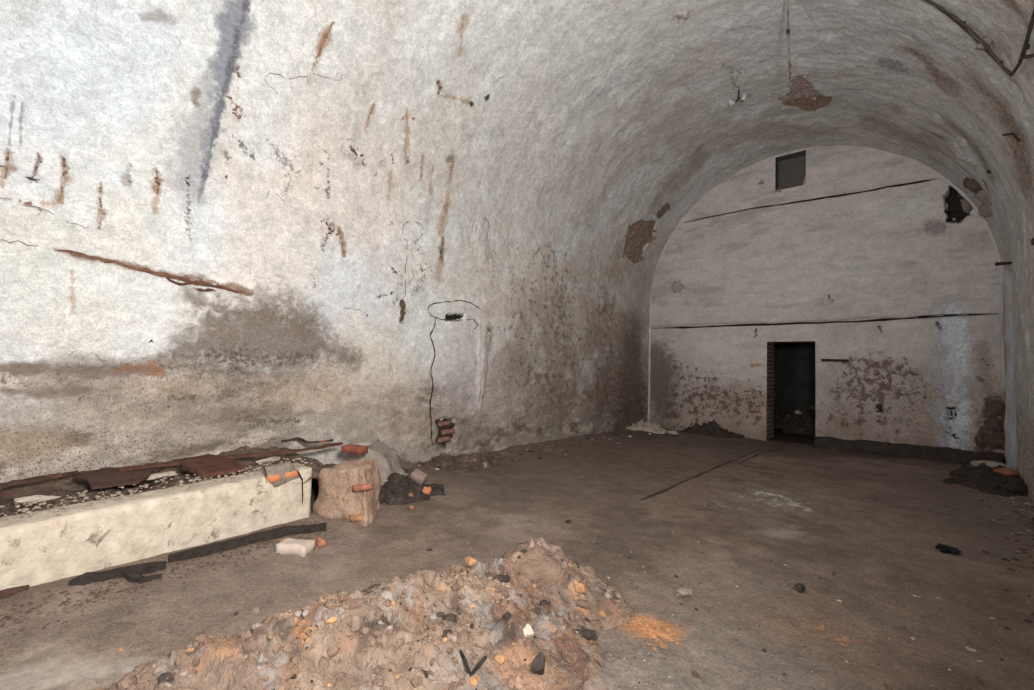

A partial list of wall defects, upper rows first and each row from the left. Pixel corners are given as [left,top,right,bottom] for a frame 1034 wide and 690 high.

rust [317,22,334,57]
peeling [777,76,820,103]
rust [19,157,70,211]
spalling [944,177,993,224]
flaking render [622,203,671,264]
rust [72,253,252,295]
damp [0,291,356,398]
spalling [435,418,457,447]